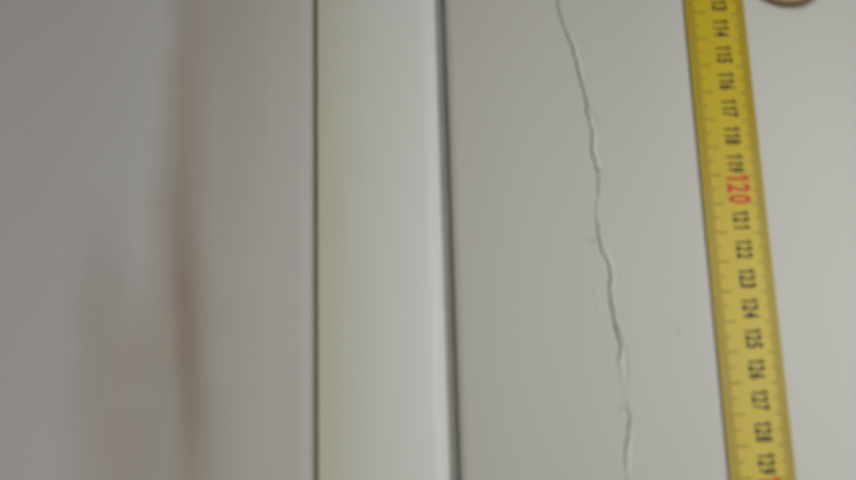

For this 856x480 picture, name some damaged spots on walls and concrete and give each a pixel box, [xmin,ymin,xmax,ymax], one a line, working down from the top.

crack [588,229,626,383]